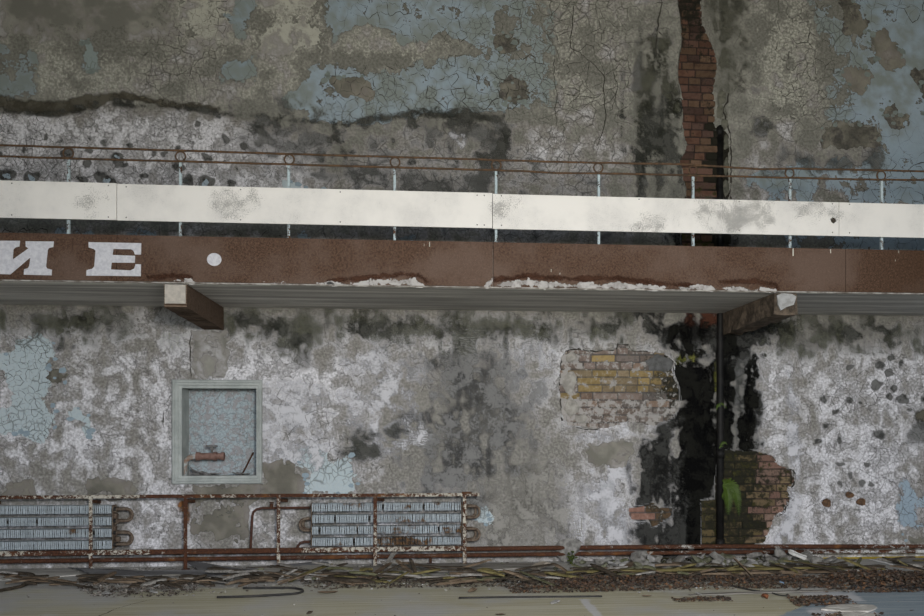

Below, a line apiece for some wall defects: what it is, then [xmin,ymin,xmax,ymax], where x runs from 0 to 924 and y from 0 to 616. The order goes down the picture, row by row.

crack [0,109,319,187]
water stain [619,26,688,198]
crack [655,0,665,65]
flaking render [678,0,732,200]
crack [769,0,924,131]
water stain [317,271,427,288]
water stain [484,273,779,293]
flaking render [682,233,731,247]
flaking render [559,343,679,430]
water stain [224,308,924,562]
flaking render [701,450,796,544]
crack [800,361,924,539]